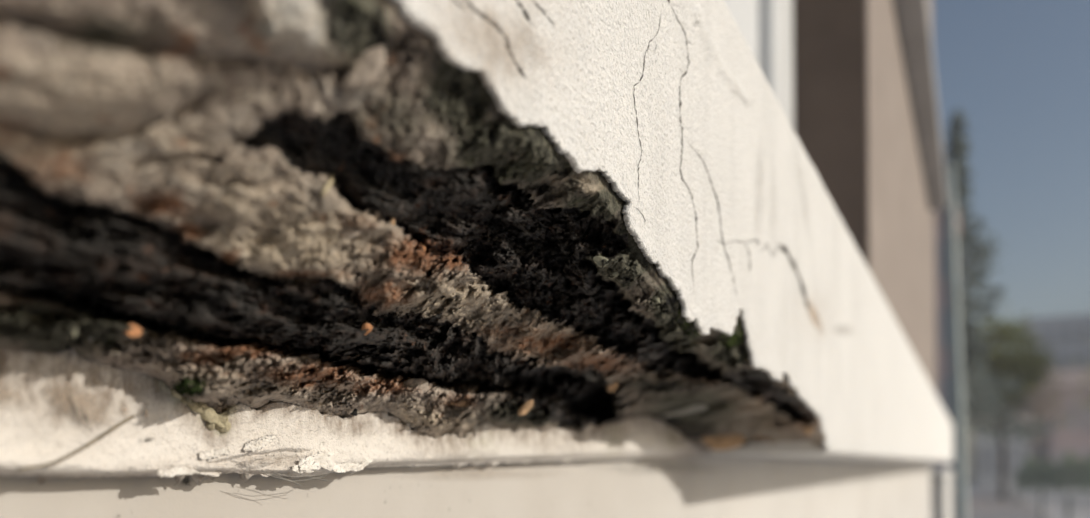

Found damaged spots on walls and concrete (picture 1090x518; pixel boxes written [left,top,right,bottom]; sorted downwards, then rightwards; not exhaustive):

crack [516,0,554,24]
crack [454,0,525,77]
crack [633,0,809,308]
spalling [0,0,824,450]
damp [170,389,231,432]
peeling [157,448,230,478]
peeling [291,450,373,474]